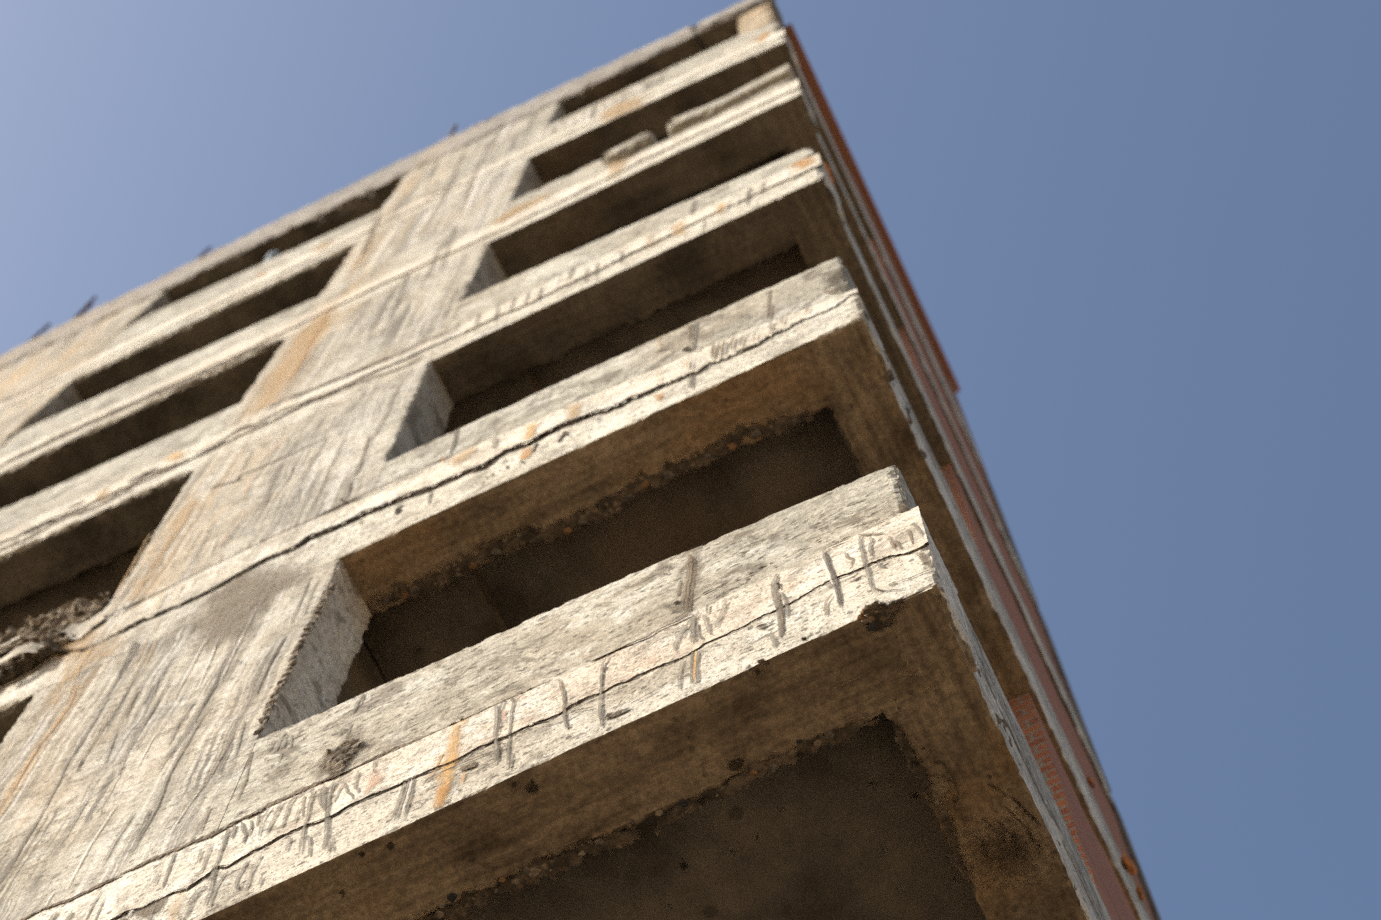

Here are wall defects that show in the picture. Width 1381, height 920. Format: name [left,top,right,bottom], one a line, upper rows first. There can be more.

spalling [0,592,114,686]
damp [0,568,319,920]
rust [429,720,465,804]
crack [79,301,843,652]
crack [110,554,931,920]